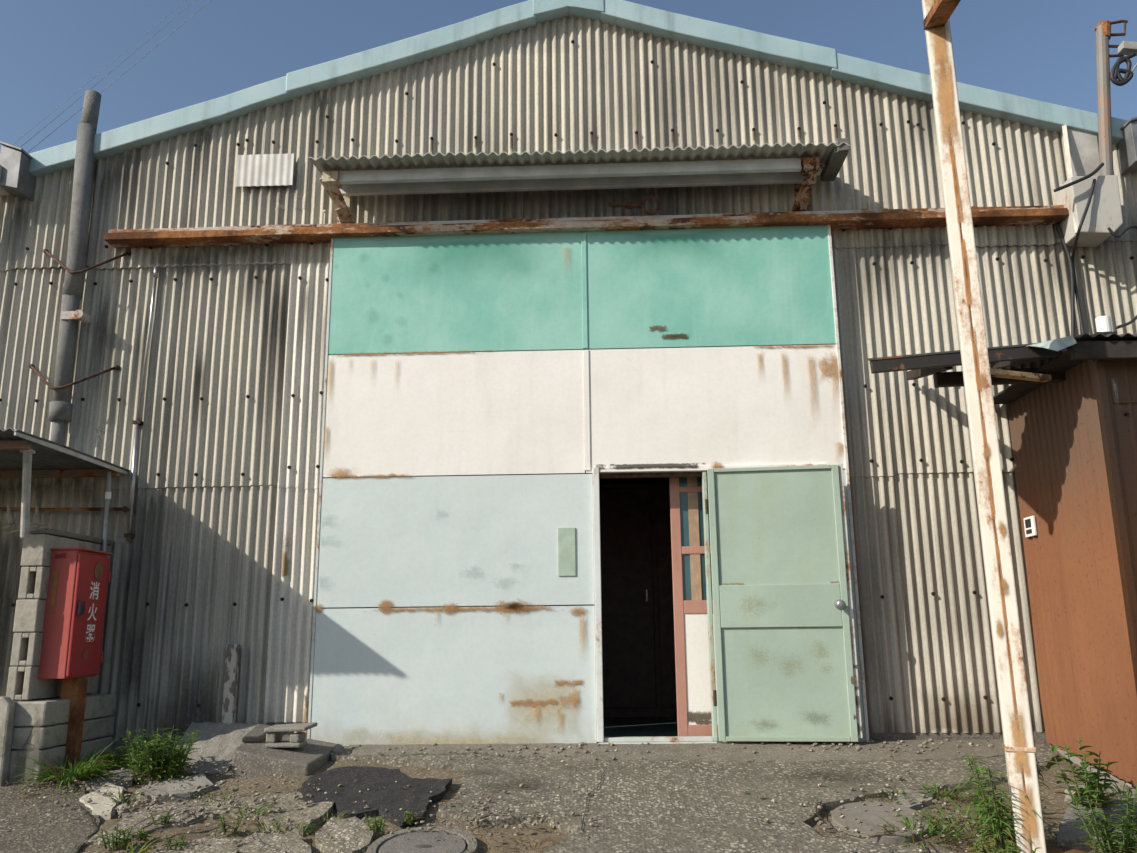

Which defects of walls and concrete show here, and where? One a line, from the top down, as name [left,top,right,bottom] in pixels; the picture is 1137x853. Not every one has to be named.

rust [933,21,963,224]
rust [960,239,984,306]
water stain [193,366,204,397]
rust [758,345,839,379]
rust [971,330,987,391]
rust [332,469,409,478]
rust [379,600,549,614]
rust [981,412,1039,838]
water stain [182,682,211,735]
rust [500,680,583,722]